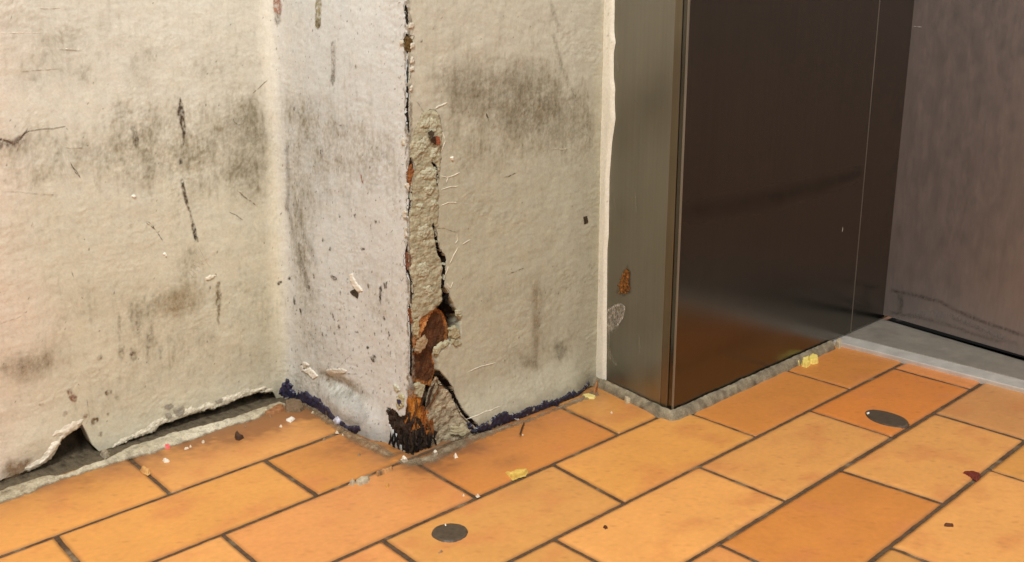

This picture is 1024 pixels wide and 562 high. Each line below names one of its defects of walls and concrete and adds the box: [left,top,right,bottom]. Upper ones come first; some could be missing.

crack [0,126,65,151]
spalling [386,0,500,455]
crack [432,223,455,319]
rust [617,268,630,294]
flaking render [0,386,289,491]
crack [434,371,478,427]